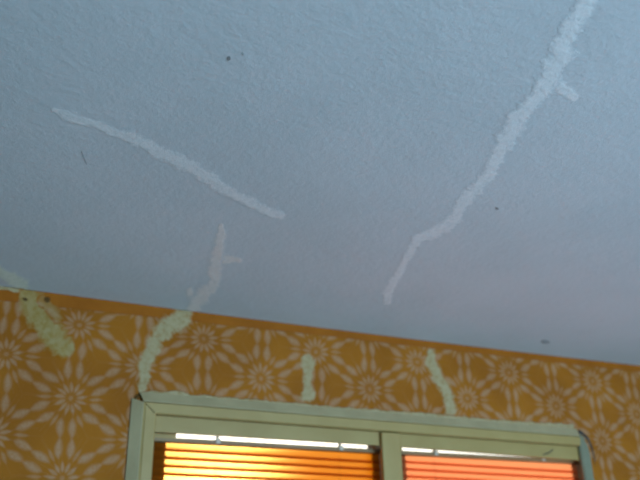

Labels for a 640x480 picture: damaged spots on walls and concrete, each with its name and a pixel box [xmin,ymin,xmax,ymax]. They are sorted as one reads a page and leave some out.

crack [50,106,286,221]
crack [380,0,599,304]
crack [0,265,76,361]
crack [134,223,243,392]
crack [296,353,319,403]
crack [423,349,459,416]